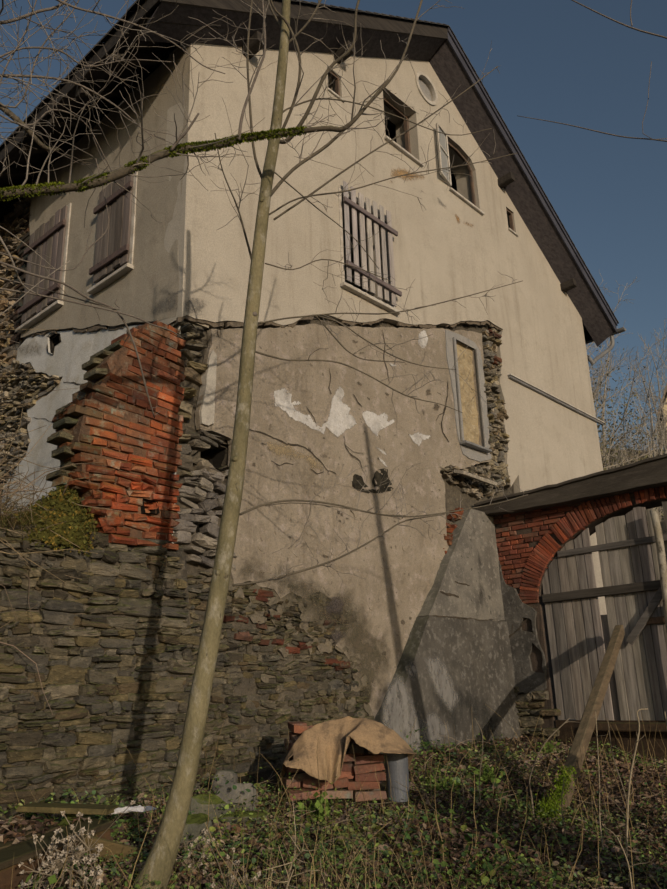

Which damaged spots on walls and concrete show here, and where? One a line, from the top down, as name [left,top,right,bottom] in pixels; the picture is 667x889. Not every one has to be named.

flaking render [73,325,124,333]
damp [154,295,203,312]
flaking render [258,316,314,328]
peeling [274,387,394,439]
flaking render [397,321,511,500]
hole [141,498,160,514]
flaking render [172,315,244,661]
flaking render [352,448,394,493]
flaking render [200,553,374,781]